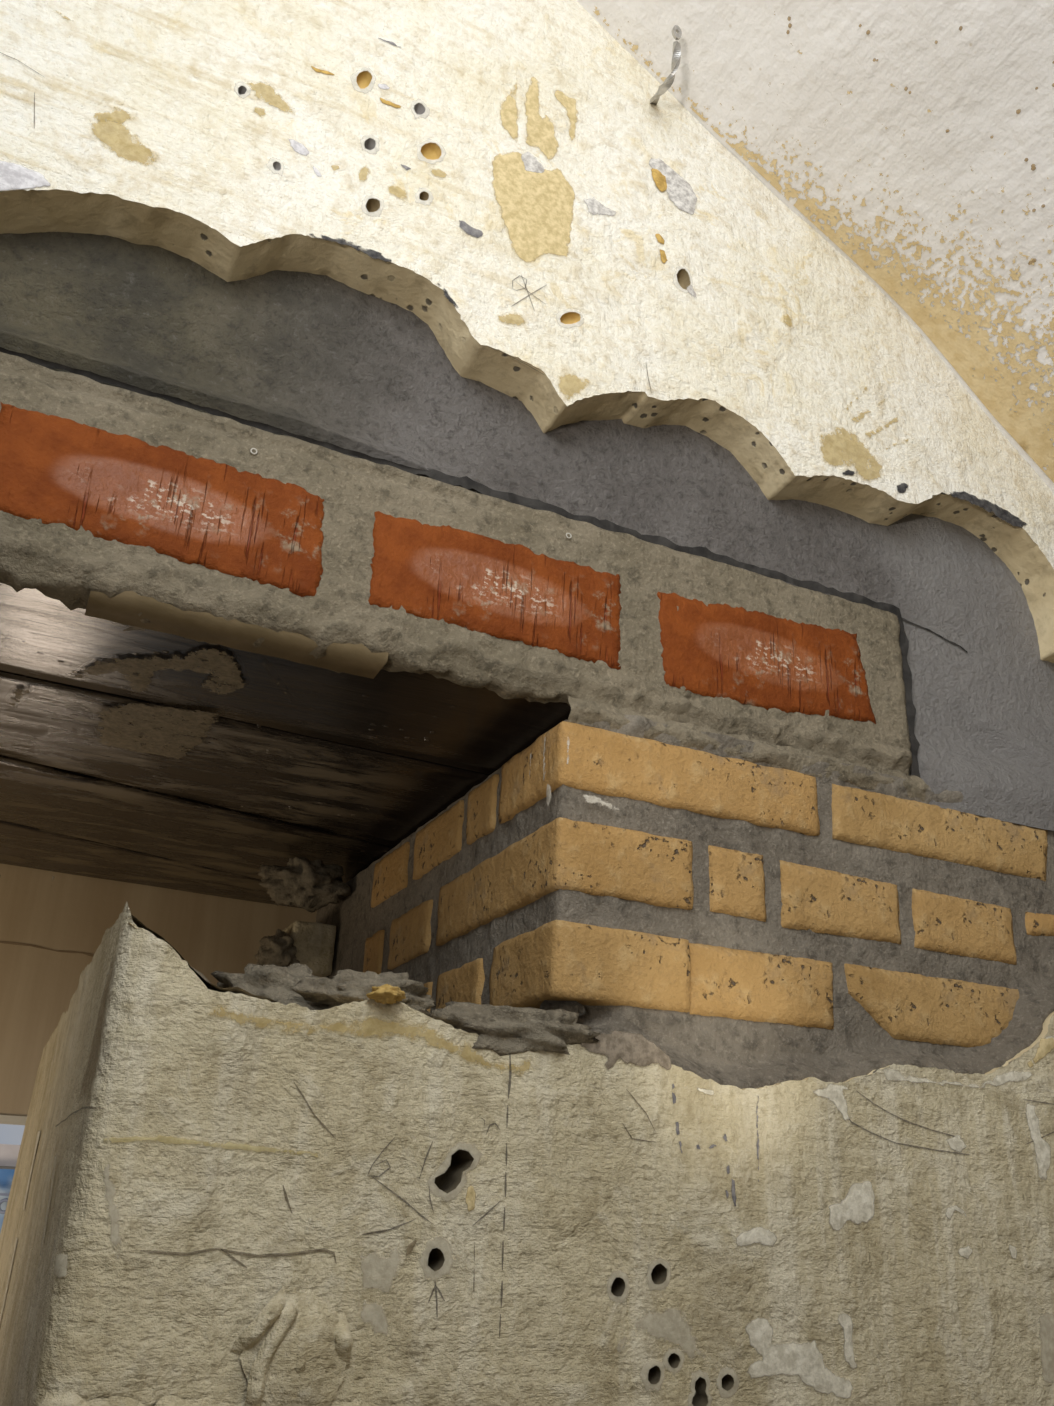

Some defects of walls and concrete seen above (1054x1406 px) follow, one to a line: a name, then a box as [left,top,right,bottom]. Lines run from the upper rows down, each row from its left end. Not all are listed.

spalling [351,68,430,119]
peeling [0,161,50,190]
peeling [492,77,616,262]
flaking render [459,220,483,238]
peeling [593,7,1054,483]
water stain [821,387,908,480]
crack [283,1185,292,1213]
flaking render [829,1181,875,1230]
crack [140,1229,391,1268]
spalling [608,1271,629,1302]
spalling [647,1258,670,1290]
flaking render [640,1314,857,1406]